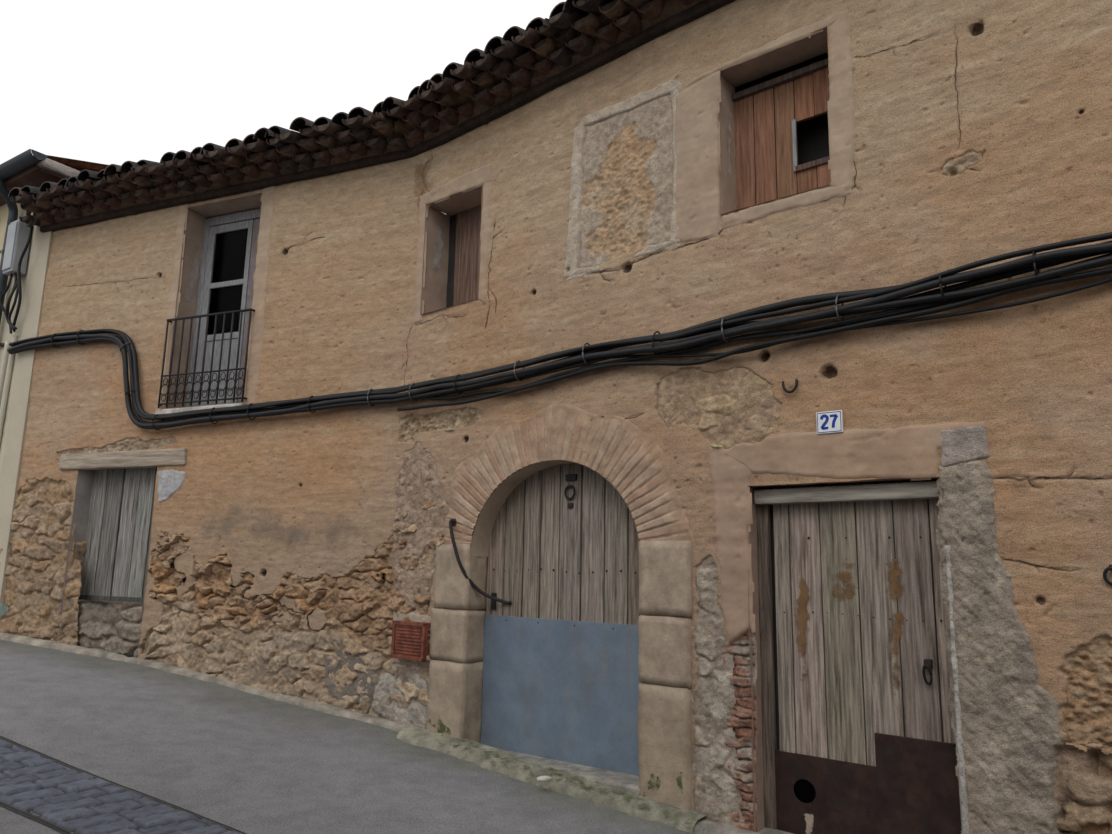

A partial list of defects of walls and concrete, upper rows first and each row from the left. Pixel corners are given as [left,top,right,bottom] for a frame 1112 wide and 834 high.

crack [856,24,983,171]
flaking render [563,80,684,281]
crack [993,470,1112,488]
flaking render [722,631,758,832]
flaking render [1060,636,1112,755]